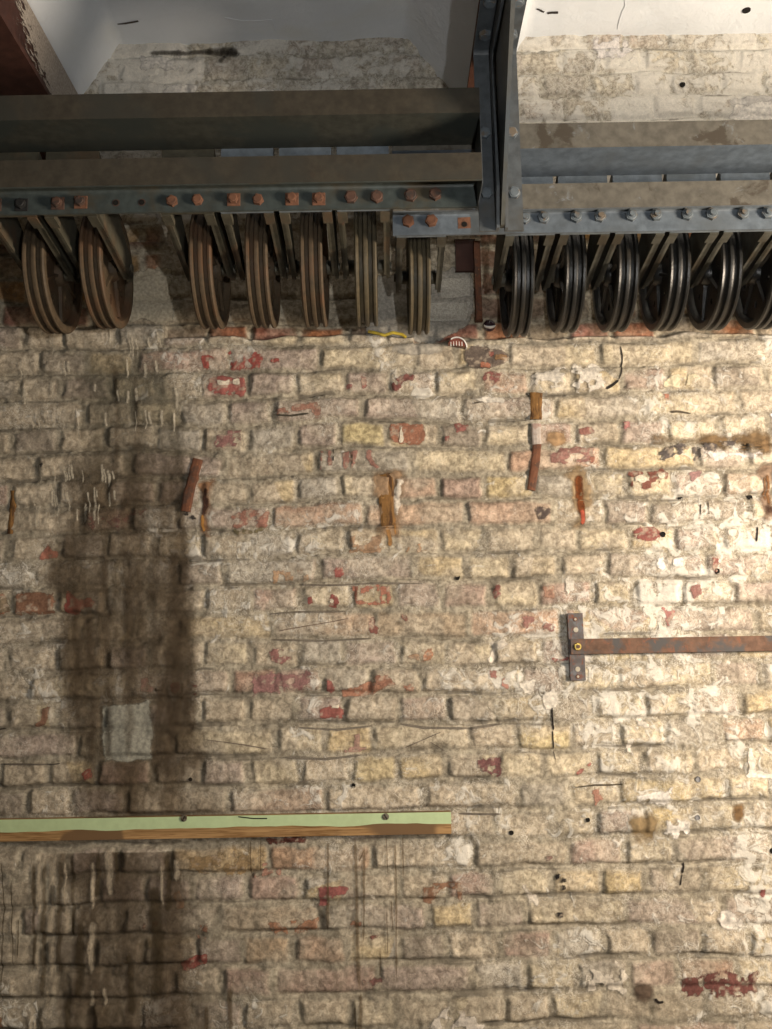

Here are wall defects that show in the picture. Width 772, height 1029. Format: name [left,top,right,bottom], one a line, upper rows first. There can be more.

water stain [117,364,178,432]
peeling [201,351,279,397]
water stain [33,464,116,527]
peeling [550,427,595,464]
rust [566,466,592,527]
rust [699,431,772,520]
water stain [91,851,123,906]
water stain [152,856,180,941]
water stain [32,863,108,1029]
peeling [682,971,758,998]